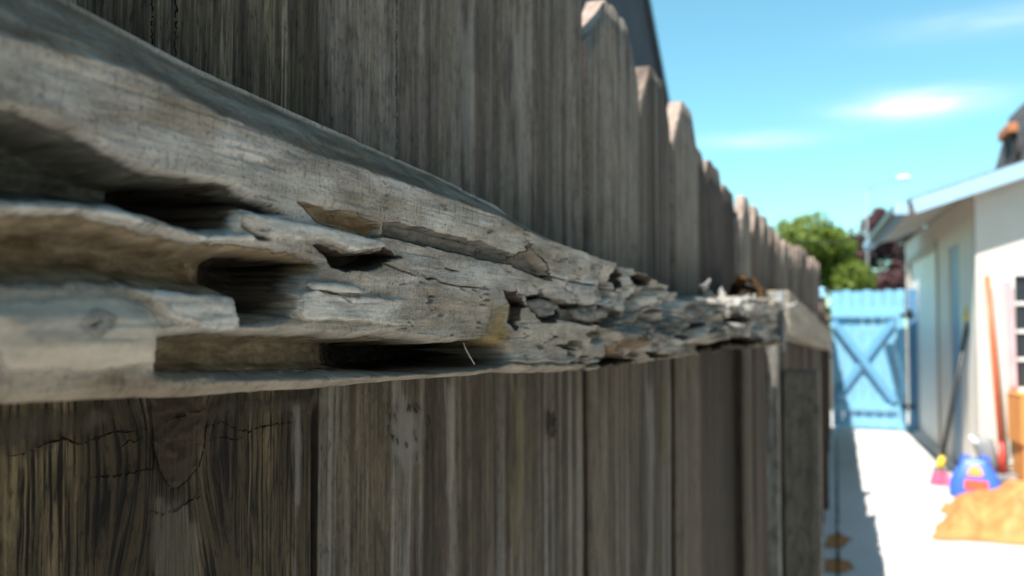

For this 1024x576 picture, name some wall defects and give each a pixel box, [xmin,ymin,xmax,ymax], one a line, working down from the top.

spalling [0,111,552,373]
spalling [607,267,651,291]
spalling [503,290,619,331]
spalling [674,275,797,354]
spalling [575,352,635,371]
crack [4,428,147,456]
crack [206,421,293,441]